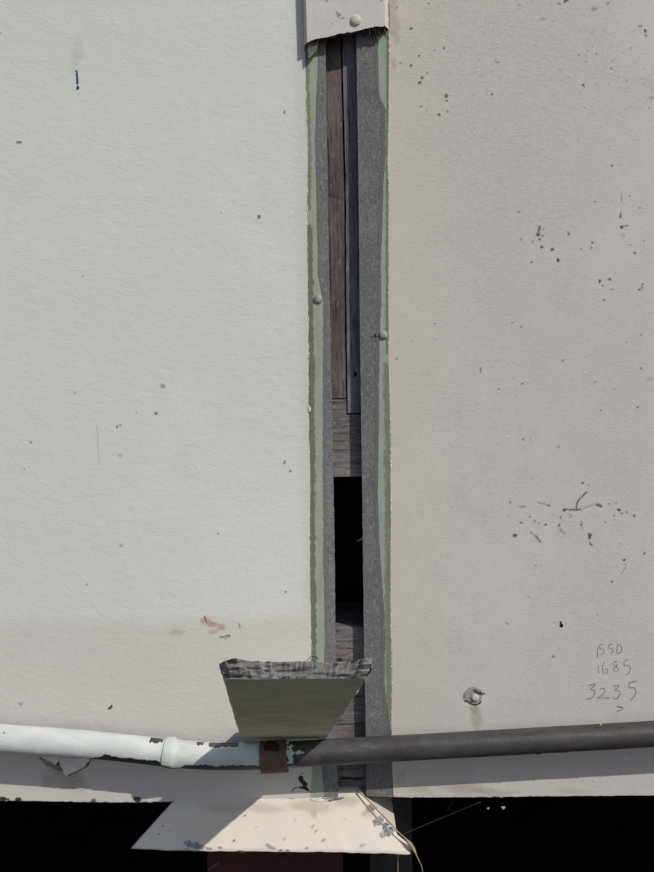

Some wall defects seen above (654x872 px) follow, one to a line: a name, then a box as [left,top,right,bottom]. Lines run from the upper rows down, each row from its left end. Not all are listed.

peeling [39,756,92,776]